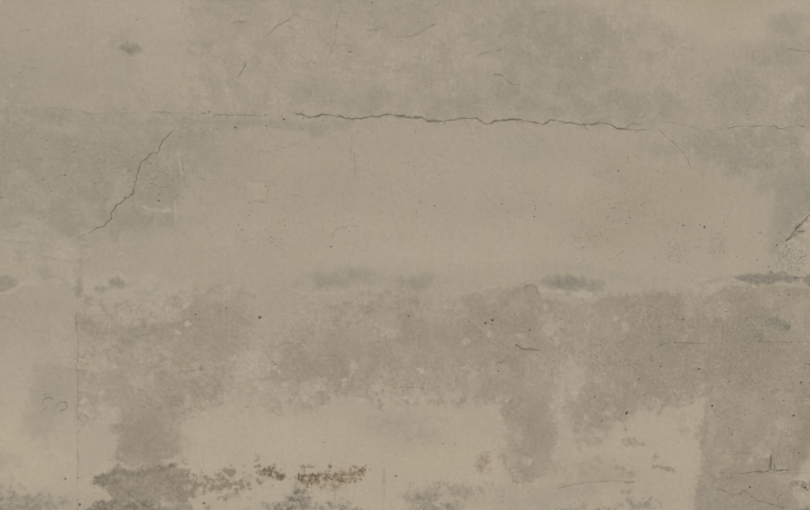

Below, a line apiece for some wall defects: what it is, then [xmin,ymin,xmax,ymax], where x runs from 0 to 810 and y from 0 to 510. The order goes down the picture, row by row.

damp [0,0,810,277]
crack [79,97,810,238]
damp [292,259,447,298]
peeling [44,268,810,510]
damp [234,486,375,510]
damp [388,450,810,510]